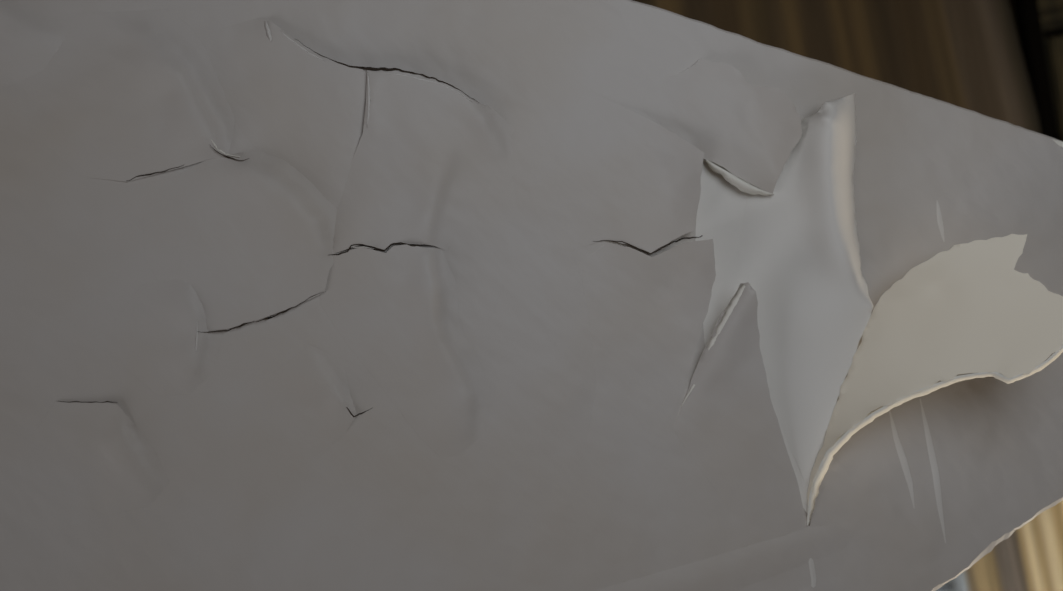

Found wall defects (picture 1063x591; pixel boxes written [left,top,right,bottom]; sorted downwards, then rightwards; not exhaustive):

crack [265,21,479,127]
crack [210,140,249,161]
crack [128,165,183,181]
crack [330,242,425,255]
crack [593,236,702,254]
peeling [511,59,1063,542]
crack [195,292,323,352]